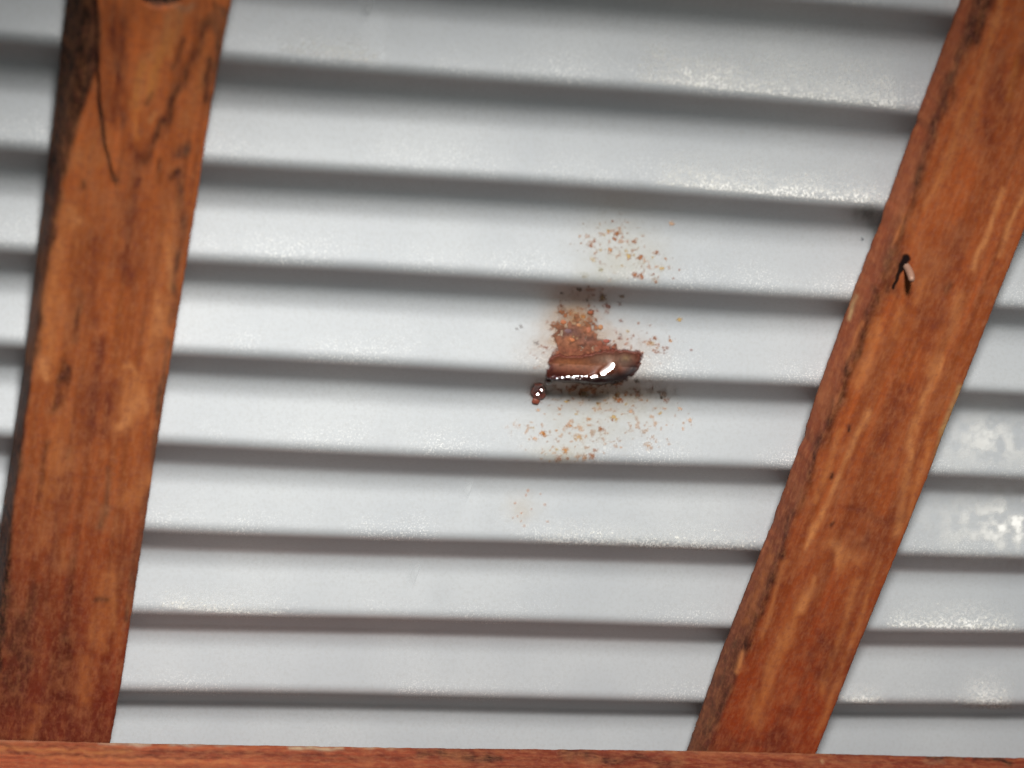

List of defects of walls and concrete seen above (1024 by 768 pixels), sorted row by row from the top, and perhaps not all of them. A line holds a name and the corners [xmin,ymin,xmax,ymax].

corrosion [530,309,643,404]